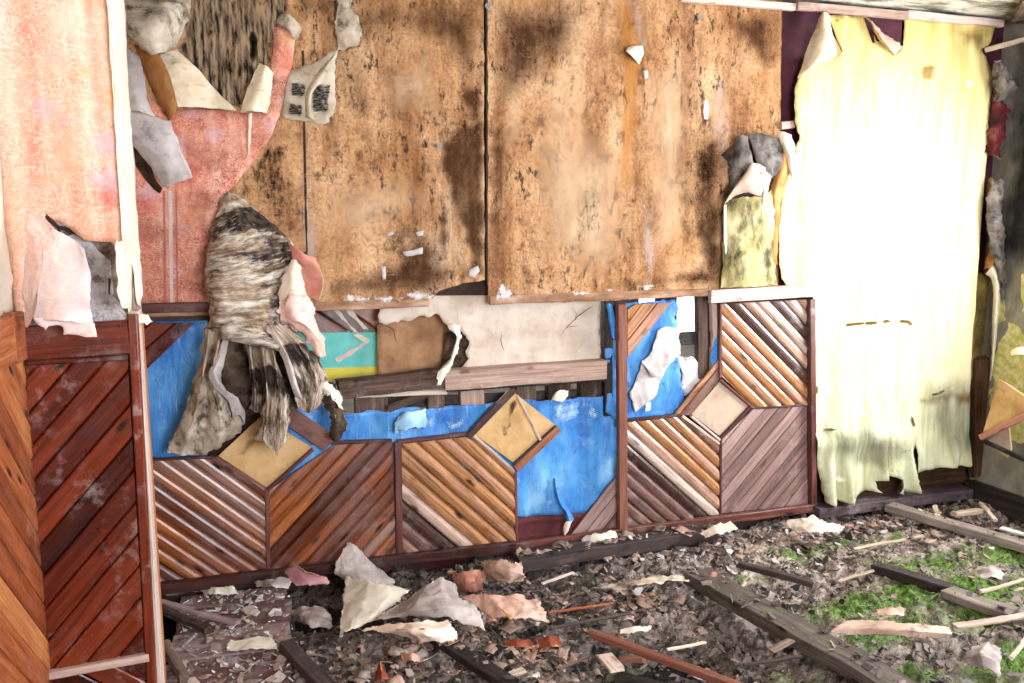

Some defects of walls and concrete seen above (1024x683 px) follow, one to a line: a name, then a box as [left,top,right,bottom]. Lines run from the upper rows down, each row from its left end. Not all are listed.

leakage [510,17,564,78]
peeling [797,12,837,78]
peeling [124,0,273,193]
peeling [992,60,1019,103]
leakage [444,90,484,273]
leakage [688,144,718,283]
peeling [22,214,129,337]
peeling [984,241,995,269]
peeling [436,334,462,385]
peeling [642,361,664,377]
peeling [988,294,1024,407]
peeling [997,421,1024,444]